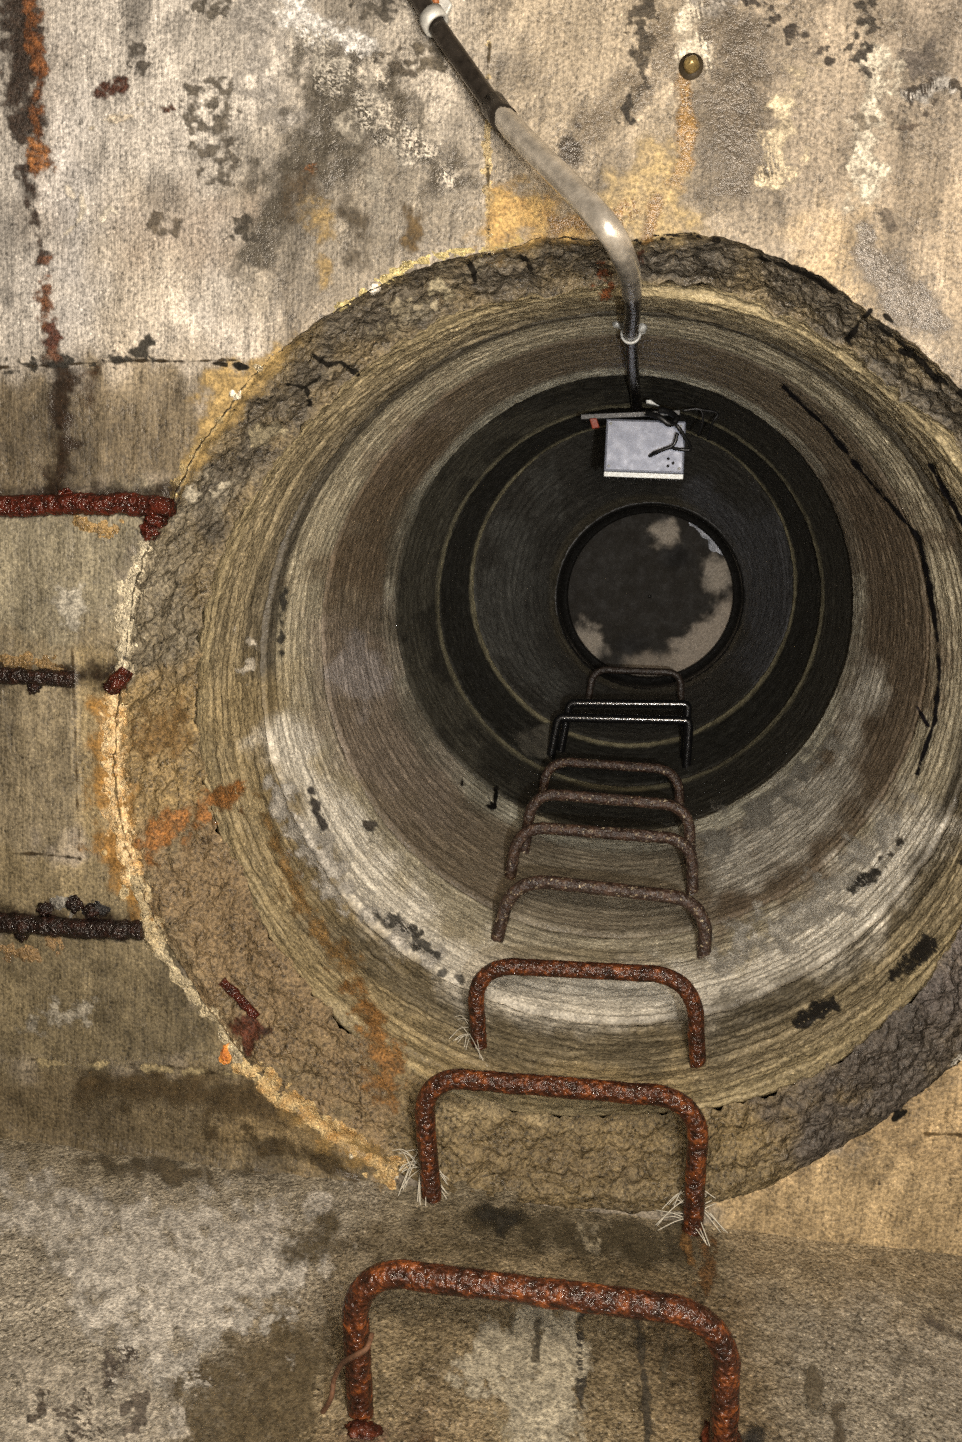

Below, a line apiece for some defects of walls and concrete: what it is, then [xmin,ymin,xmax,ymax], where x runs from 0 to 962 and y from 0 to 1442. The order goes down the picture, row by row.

rust [0,0,99,495]
water stain [229,0,592,340]
crack [286,353,360,406]
rust [129,697,191,758]
water stain [0,540,408,1190]
rust [133,781,406,1114]
water stain [263,774,447,978]
water stain [0,1153,357,1442]
water stain [444,1305,593,1442]
water stain [468,1202,694,1267]
water stain [633,1320,669,1442]
rust [680,1232,718,1295]